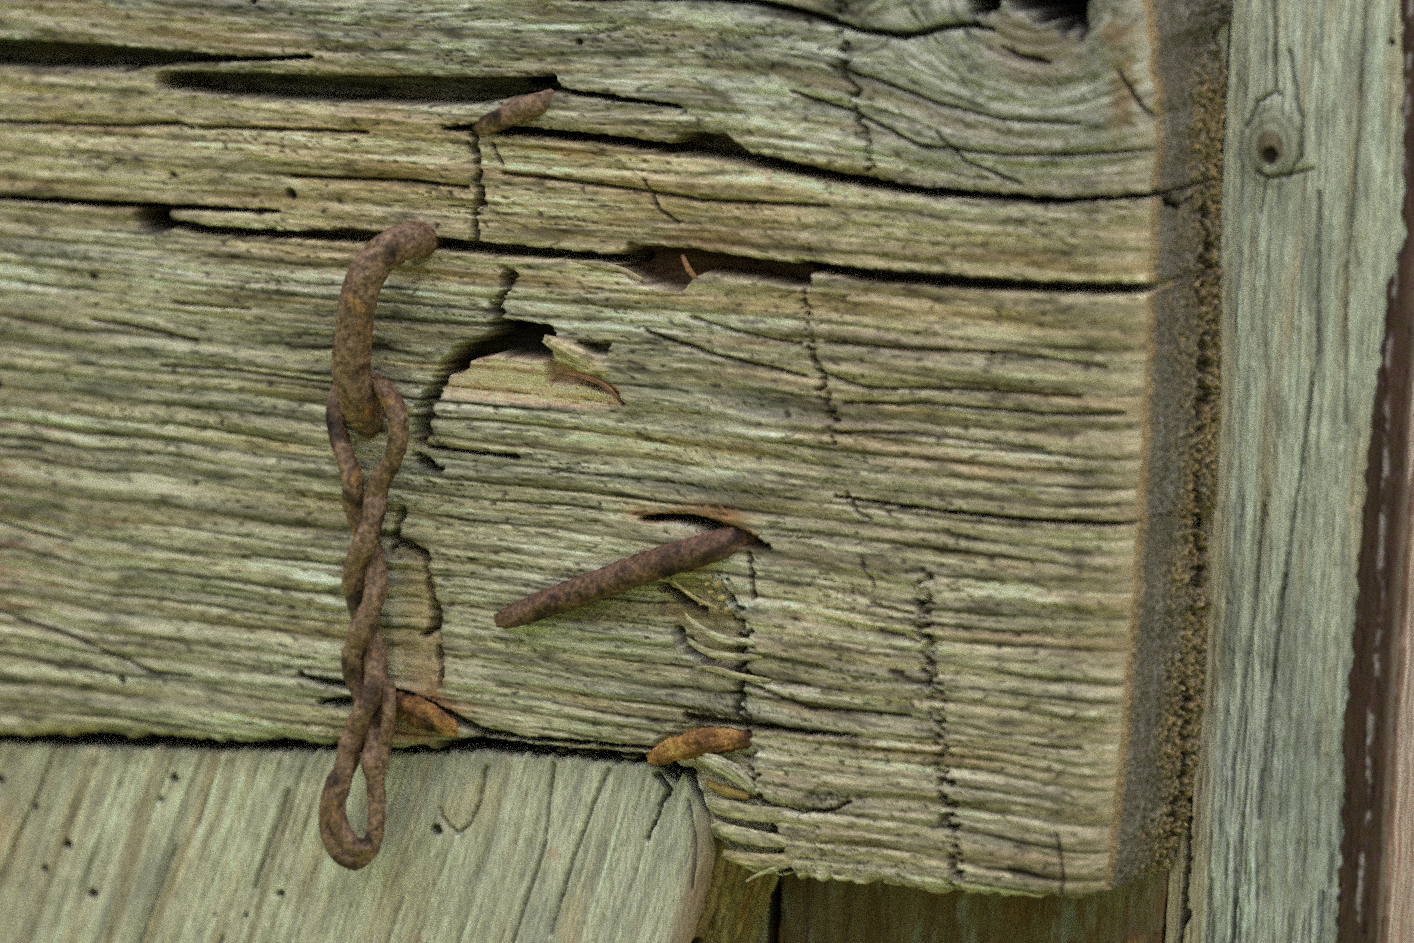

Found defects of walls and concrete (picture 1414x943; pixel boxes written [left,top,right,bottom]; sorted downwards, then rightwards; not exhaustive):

crack [0,0,1195,328]
crack [88,299,333,386]
crack [643,257,1167,452]
crack [409,357,521,476]
corrosion [608,497,776,580]
crack [833,489,1145,530]
crack [0,607,194,680]
crack [304,673,354,711]
corrosion [392,719,447,748]
corrosion [414,672,482,721]
crack [385,501,724,943]
crack [638,511,973,894]